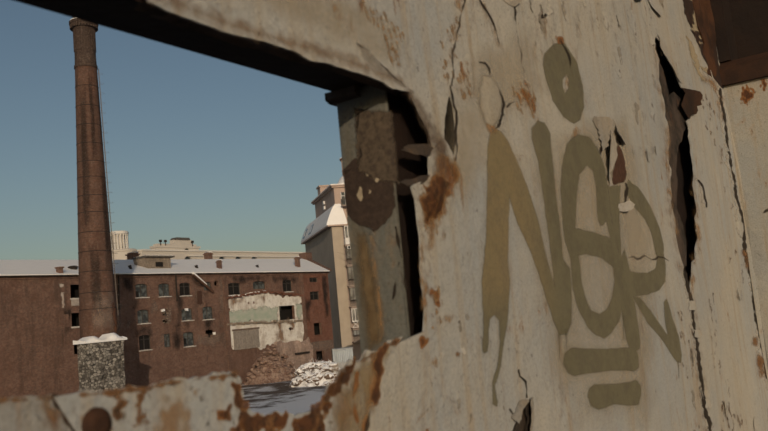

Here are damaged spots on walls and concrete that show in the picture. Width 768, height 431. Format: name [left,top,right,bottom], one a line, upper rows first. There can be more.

crack [451,0,499,86]
corrosion [513,82,536,118]
corrosion [740,78,767,104]
peeling [342,158,396,232]
corrosion [419,154,463,259]
peeling [593,116,635,212]
corrosion [79,379,181,427]
corrosion [210,338,400,431]
crack [632,255,726,431]